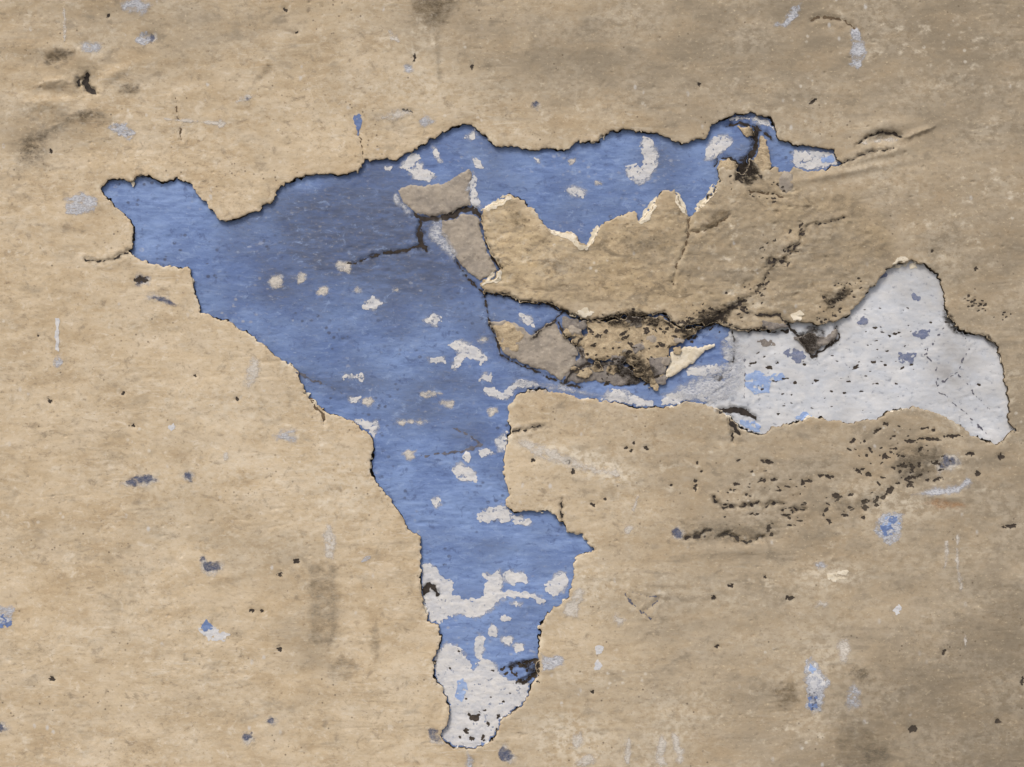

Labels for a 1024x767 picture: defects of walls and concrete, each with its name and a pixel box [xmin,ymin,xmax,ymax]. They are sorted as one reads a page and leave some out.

peeling [65,112,1015,764]
crack [347,206,845,441]
damp [925,478,971,495]